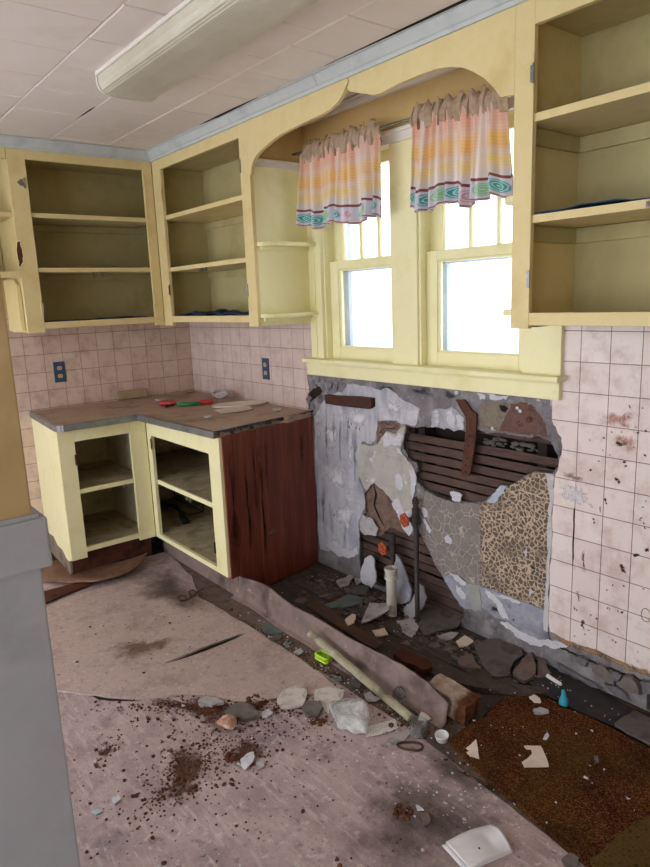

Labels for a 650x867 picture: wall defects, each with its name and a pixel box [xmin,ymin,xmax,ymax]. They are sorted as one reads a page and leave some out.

peeling [307,376,569,649]